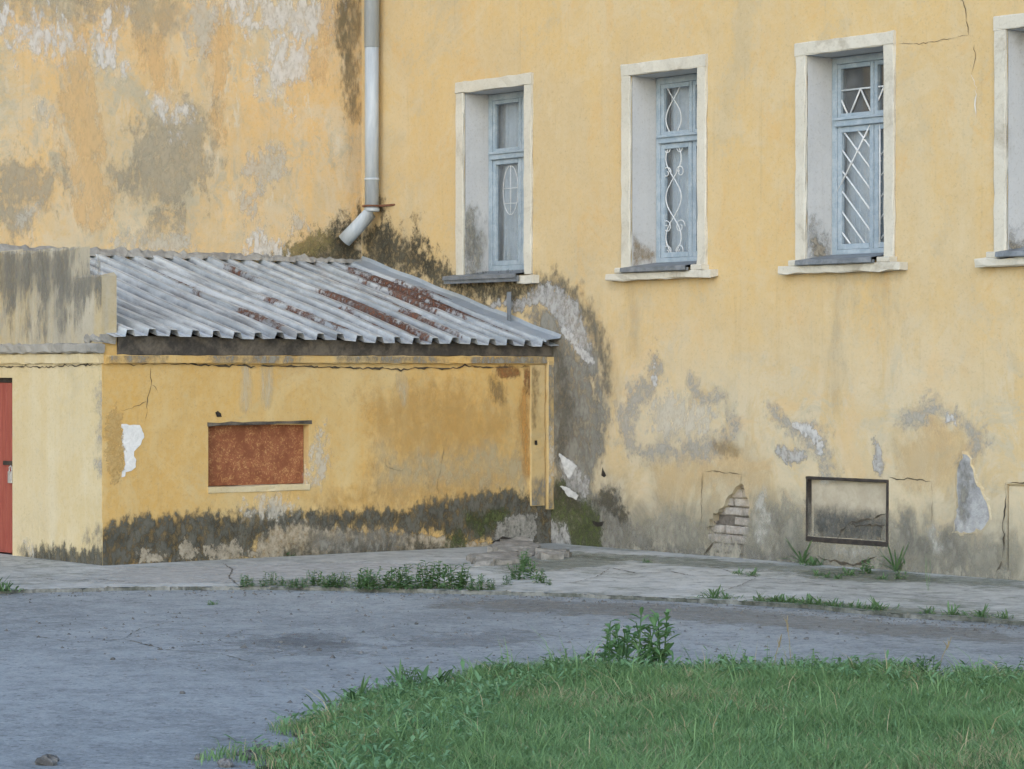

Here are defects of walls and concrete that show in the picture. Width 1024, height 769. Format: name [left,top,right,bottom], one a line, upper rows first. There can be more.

leakage [183,0,361,114]
crack [906,0,977,112]
leakage [0,2,130,232]
leakage [270,197,532,306]
corrosion [236,308,281,329]
corrosion [264,297,348,330]
flaking render [95,400,144,485]
crack [125,363,529,416]
leakage [21,307,1010,580]
peeling [559,453,606,502]
flaking render [708,485,750,558]
flaking render [903,399,992,537]